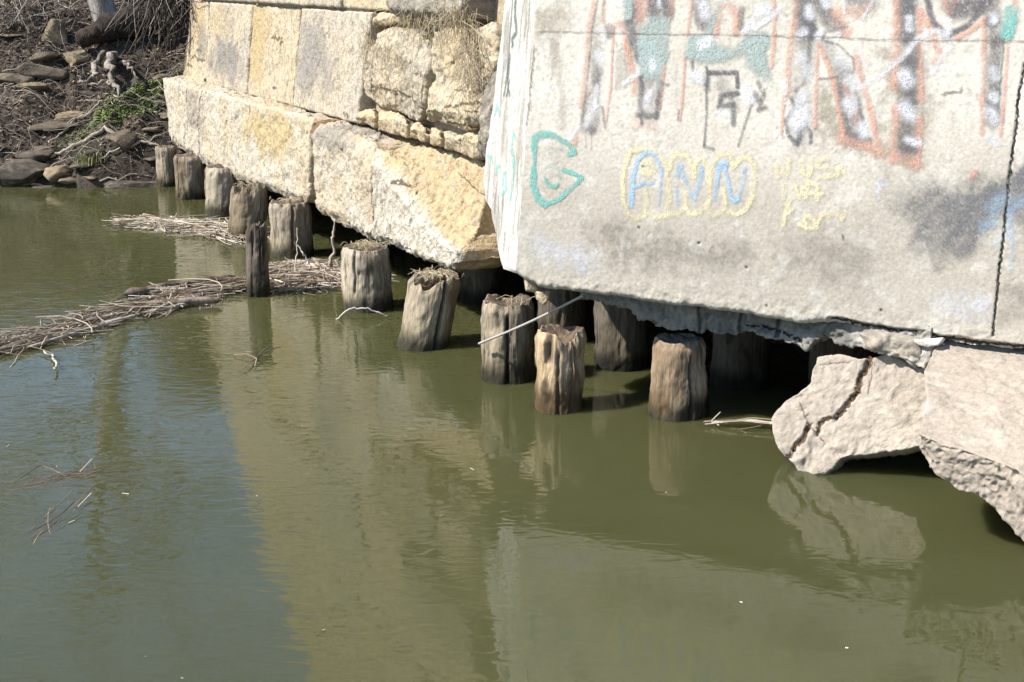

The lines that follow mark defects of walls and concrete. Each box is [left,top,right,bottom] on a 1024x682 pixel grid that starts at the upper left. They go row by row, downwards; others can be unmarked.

spalling [858,331,945,368]